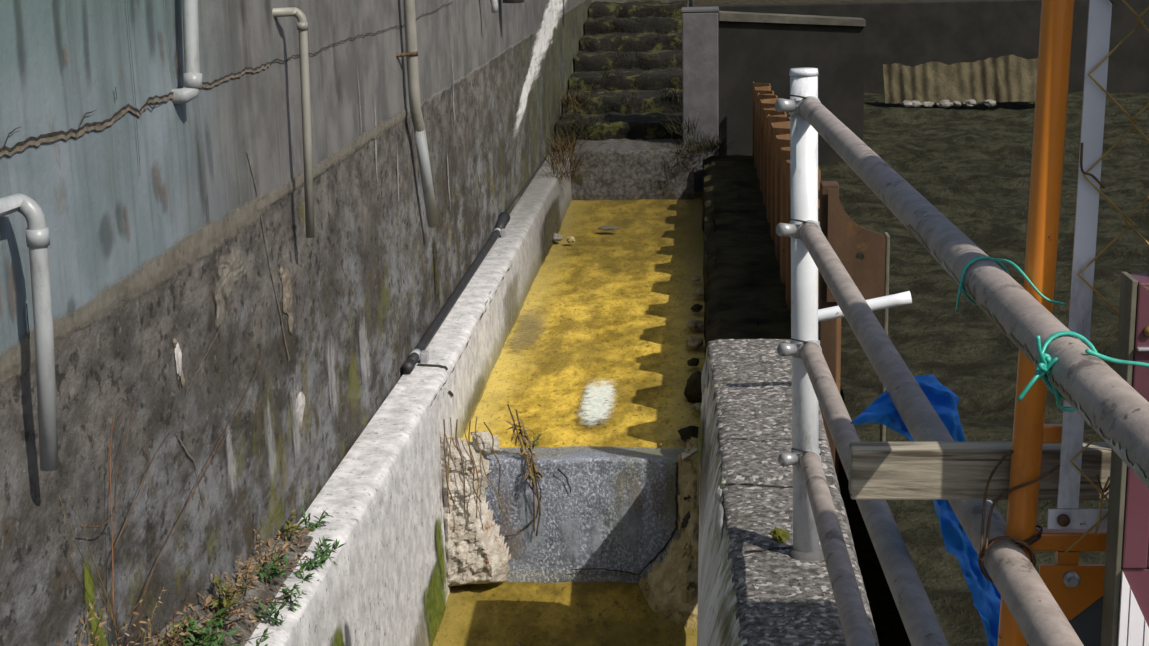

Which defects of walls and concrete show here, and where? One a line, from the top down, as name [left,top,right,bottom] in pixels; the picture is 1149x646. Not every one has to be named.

crack [0,0,453,164]
damp [327,344,337,408]
damp [360,323,370,379]
damp [227,431,235,486]
damp [292,388,300,453]
spalling [440,428,511,587]
damp [84,563,107,646]
damp [424,519,446,646]